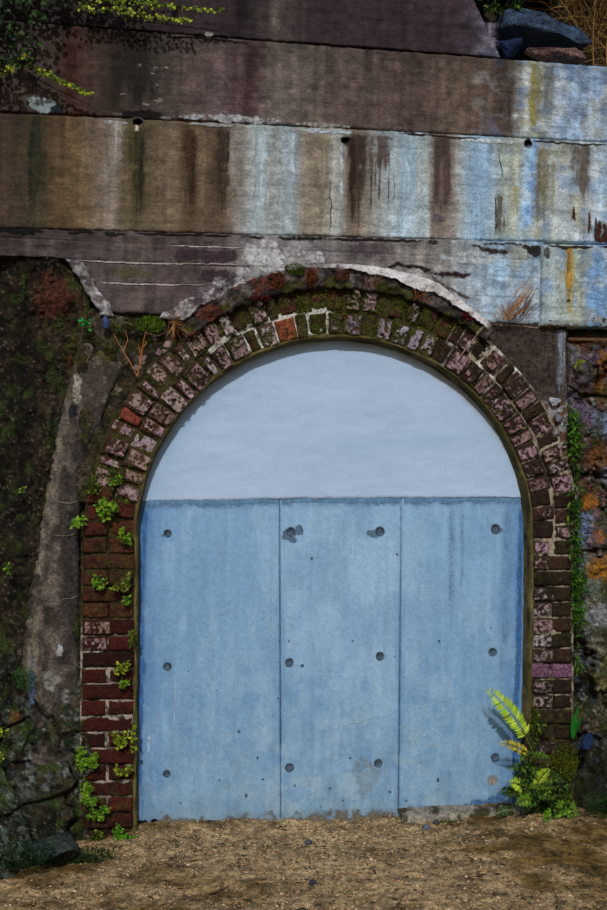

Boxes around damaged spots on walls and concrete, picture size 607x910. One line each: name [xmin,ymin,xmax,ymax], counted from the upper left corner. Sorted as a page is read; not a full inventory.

damp [100,120,145,209]
damp [179,113,516,223]
damp [495,196,505,231]
corrosion [588,212,607,244]
corrosion [565,248,575,312]
crack [22,696,75,753]